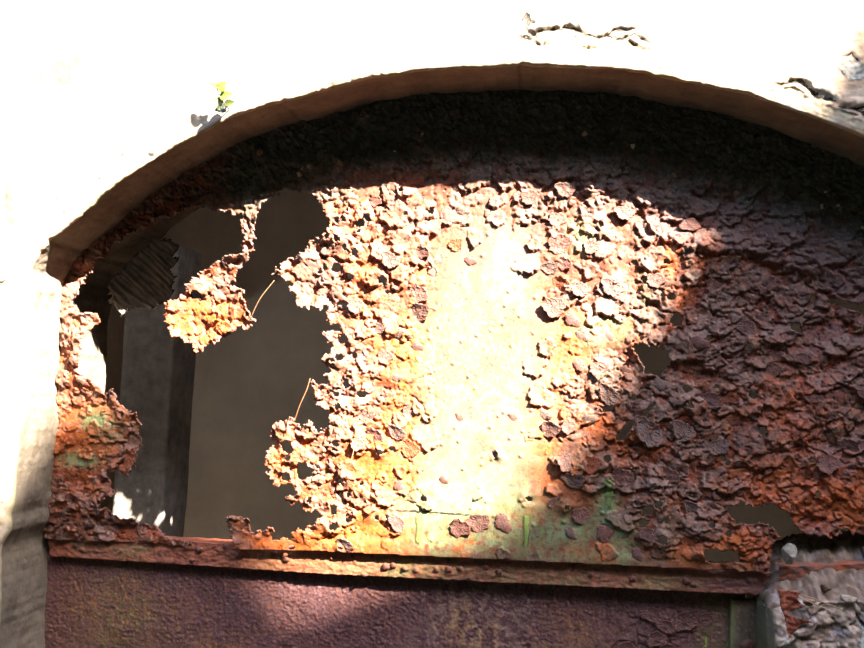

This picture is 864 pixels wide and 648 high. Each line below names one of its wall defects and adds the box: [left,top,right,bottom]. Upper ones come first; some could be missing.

crack [518,12,660,49]
spalling [771,76,864,130]
rust [554,182,576,198]
rust [614,206,635,220]
rust [381,251,400,269]
rust [540,211,600,342]
rust [646,273,667,288]
rust [347,298,365,314]
rust [350,424,420,458]
rust [634,415,696,448]
rust [556,453,602,489]
rust [449,513,512,538]